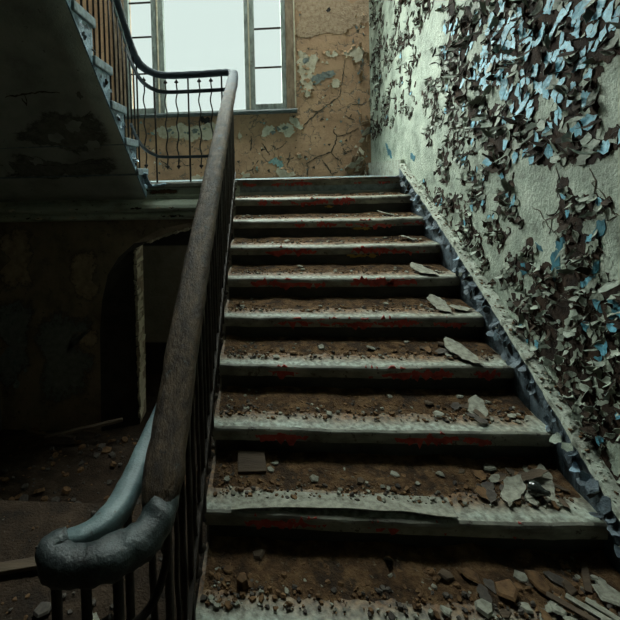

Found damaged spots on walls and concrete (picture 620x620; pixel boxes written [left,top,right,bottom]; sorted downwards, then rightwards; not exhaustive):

peeling [130,120,216,171]
peeling [240,115,313,187]
crack [246,63,361,177]
peeling [250,278,326,290]
peeling [265,246,317,257]
peeling [278,0,620,486]
peeling [543,399,620,537]